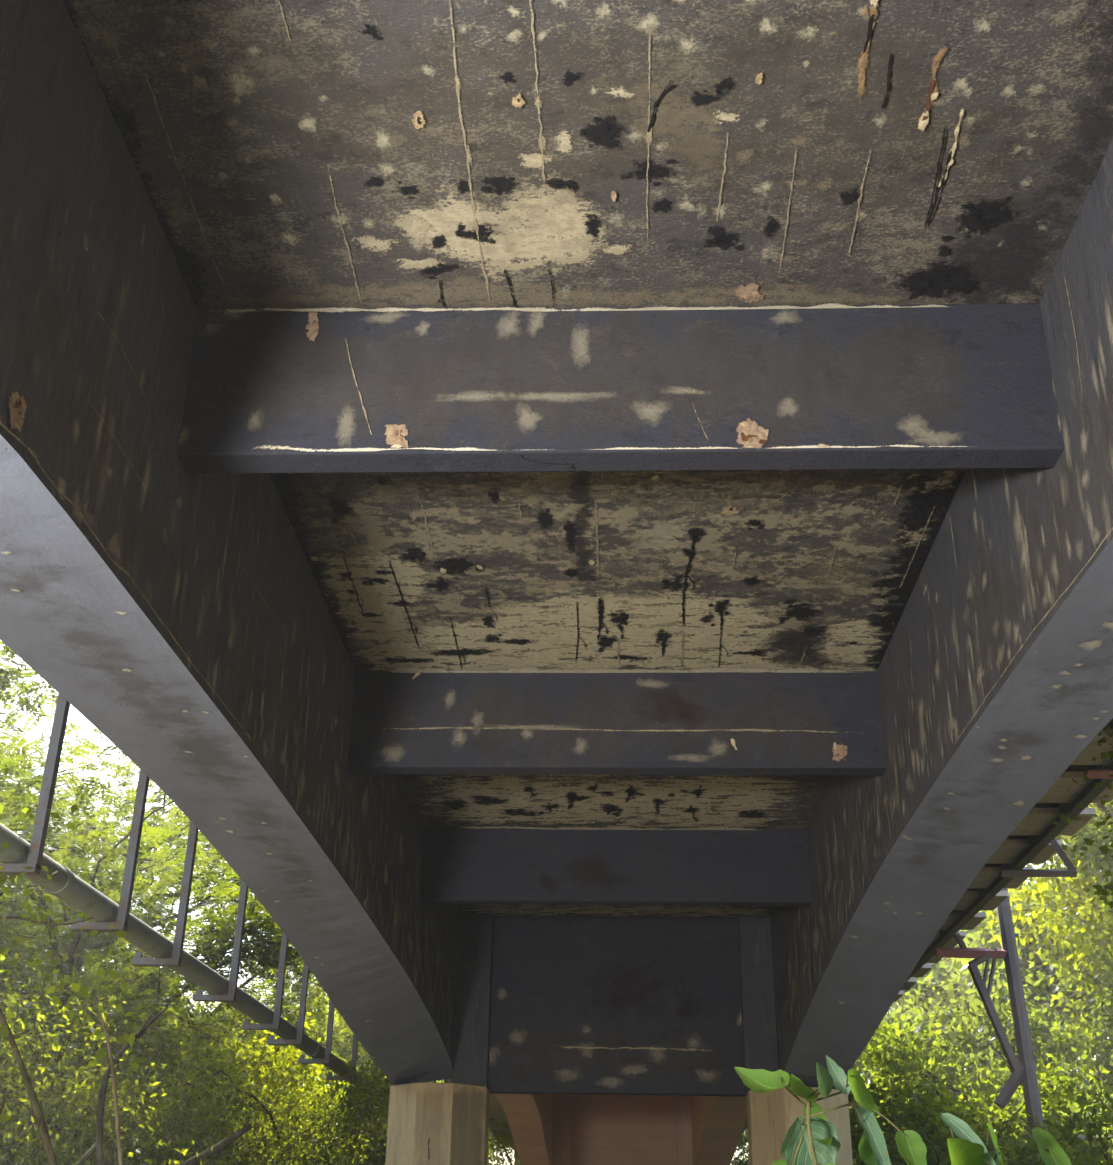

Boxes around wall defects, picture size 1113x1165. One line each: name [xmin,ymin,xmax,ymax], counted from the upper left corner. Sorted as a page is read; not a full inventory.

water stain [145,0,947,335]
crack [925,128,951,229]
spalling [8,391,27,433]
water stain [521,393,611,427]
spalling [384,424,408,449]
spalling [736,418,769,448]
water stain [773,418,967,448]
water stain [386,587,863,687]
water stain [500,725,563,737]
water stain [712,739,737,754]
spalling [832,742,848,762]
water stain [457,785,756,830]